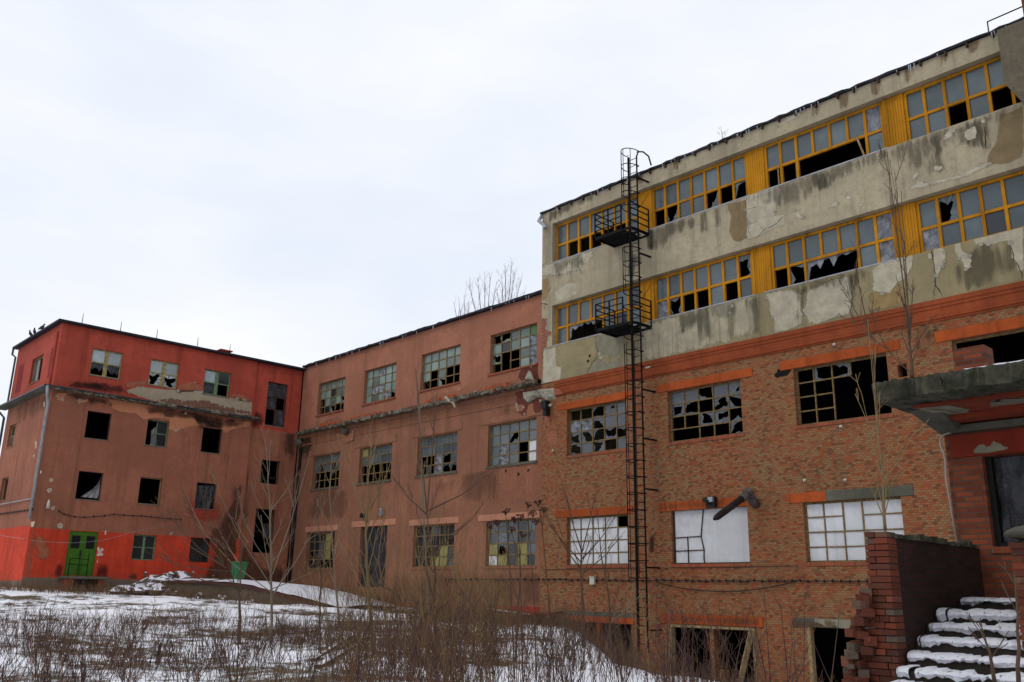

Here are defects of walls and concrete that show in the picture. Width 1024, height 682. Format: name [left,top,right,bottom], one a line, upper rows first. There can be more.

peeling [745,186,804,239]
peeling [872,255,913,295]
peeling [928,227,1024,278]
water stain [641,296,759,359]
peeling [765,276,854,333]
peeling [425,320,562,416]
spalling [104,381,252,433]
peeling [974,441,1008,453]
spalling [814,587,877,682]